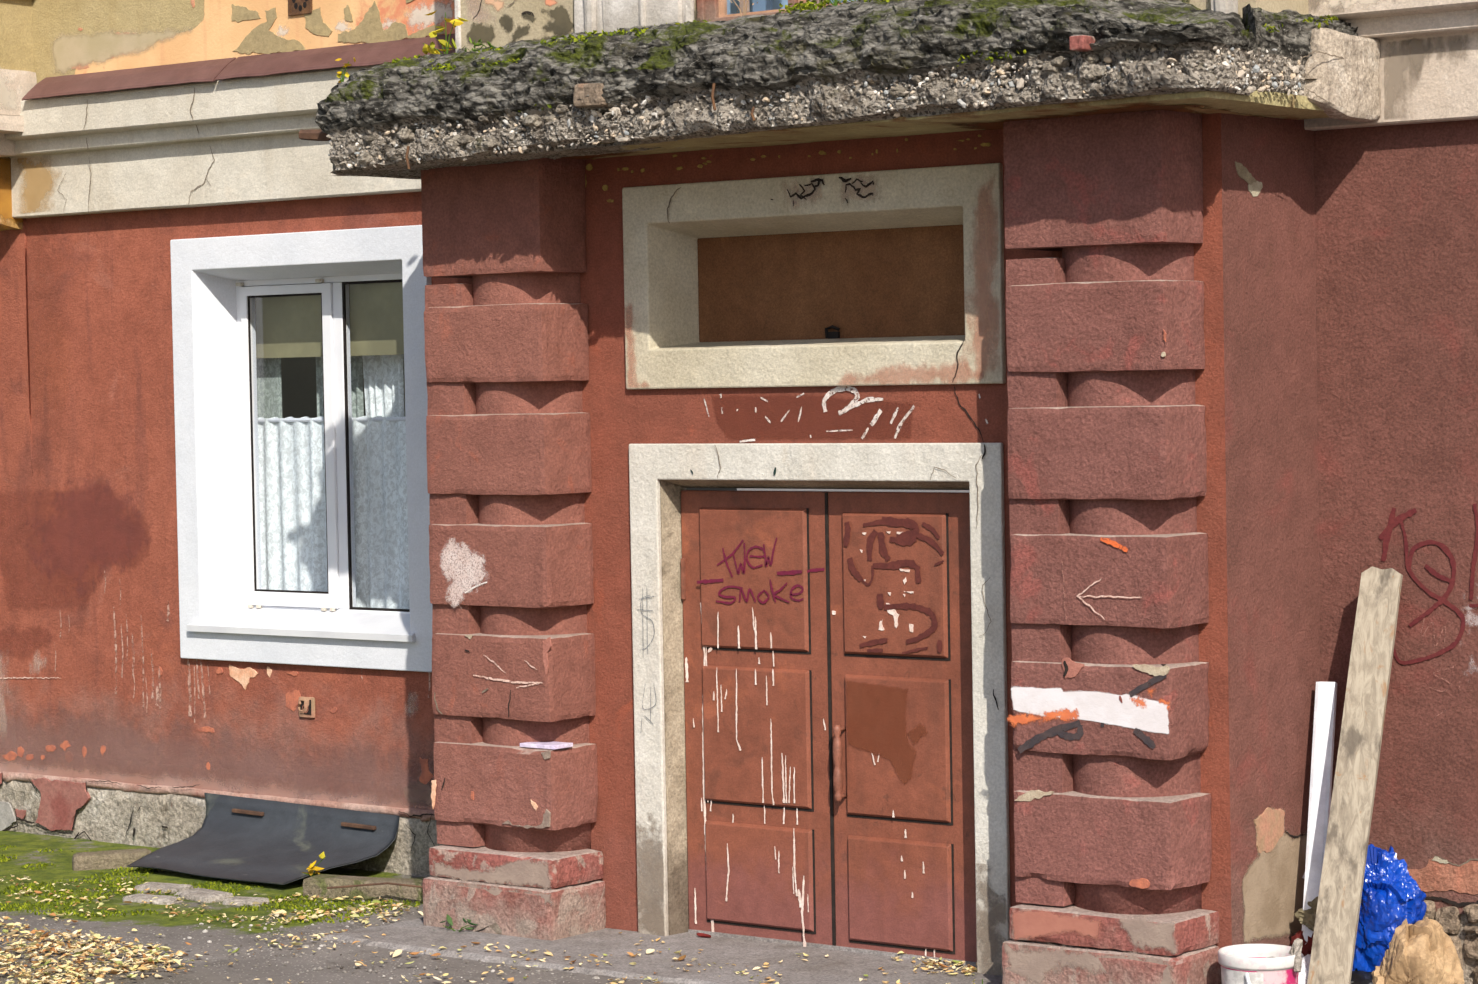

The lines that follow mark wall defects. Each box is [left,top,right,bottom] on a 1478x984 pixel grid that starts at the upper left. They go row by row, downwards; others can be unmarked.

peeling [53,0,455,75]
crack [188,87,215,205]
crack [930,341,986,529]
peeling [0,741,106,831]
peeling [1407,855,1478,895]